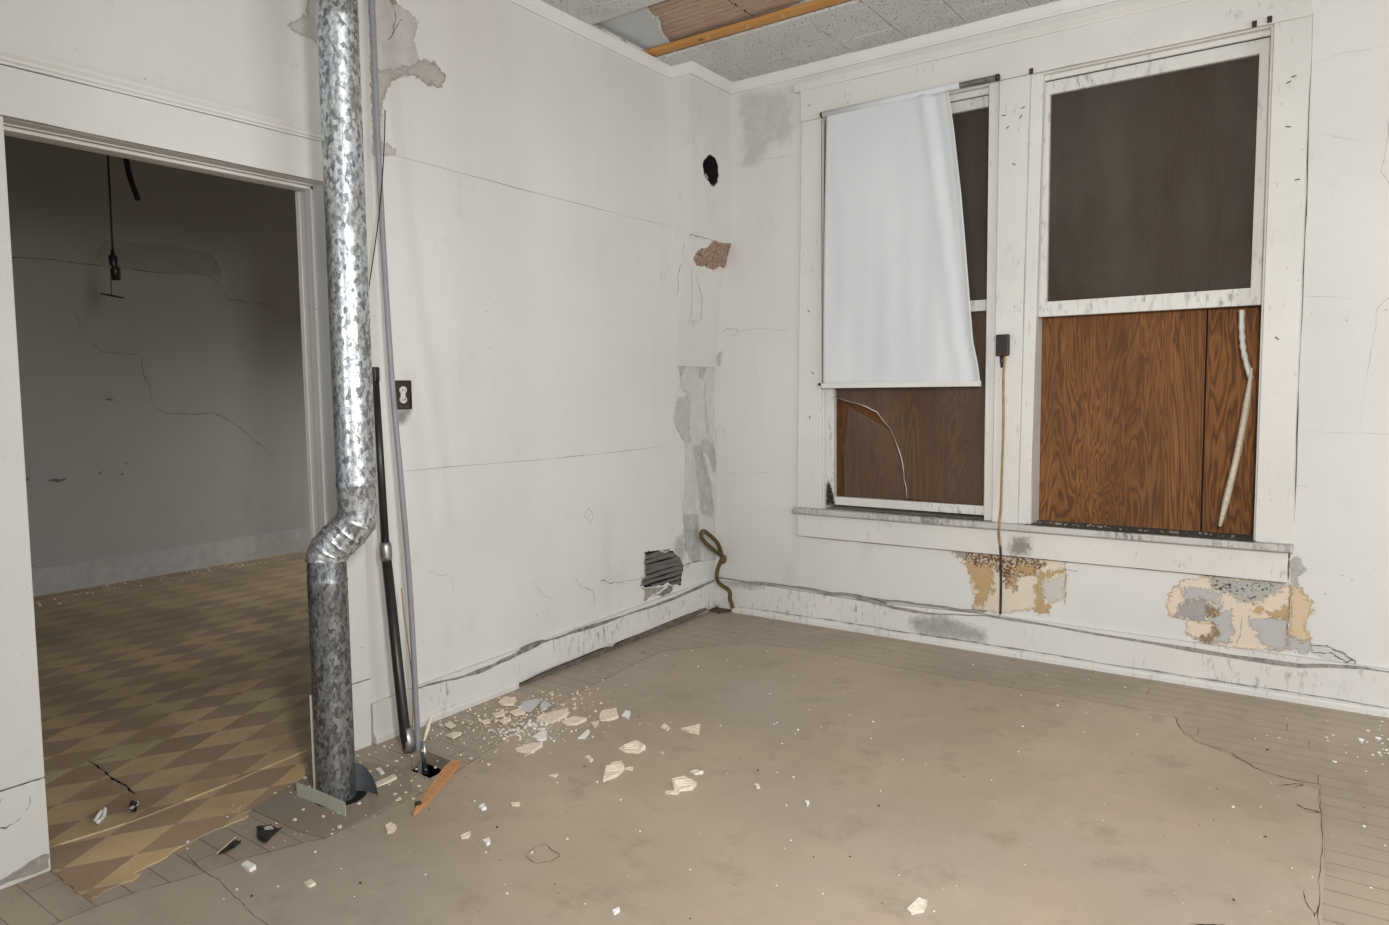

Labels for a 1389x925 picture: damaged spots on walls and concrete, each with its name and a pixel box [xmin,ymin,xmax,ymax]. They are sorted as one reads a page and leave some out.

flaking render [693,240,731,270]
crack [1294,22,1389,519]
flaking render [602,549,697,602]
crack [1178,723,1323,925]